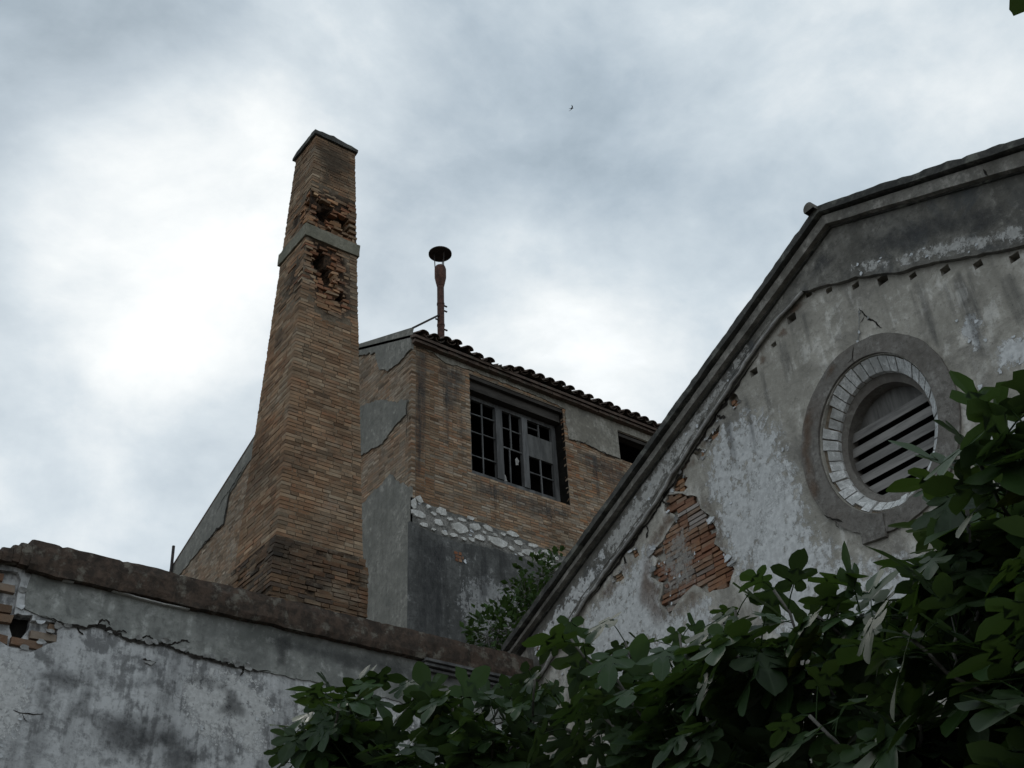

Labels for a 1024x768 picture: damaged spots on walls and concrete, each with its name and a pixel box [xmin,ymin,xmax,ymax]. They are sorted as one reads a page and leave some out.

peeling [851,226,1024,276]
crack [848,309,881,363]
peeling [534,344,918,661]
peeling [0,573,62,758]
crack [46,616,270,676]